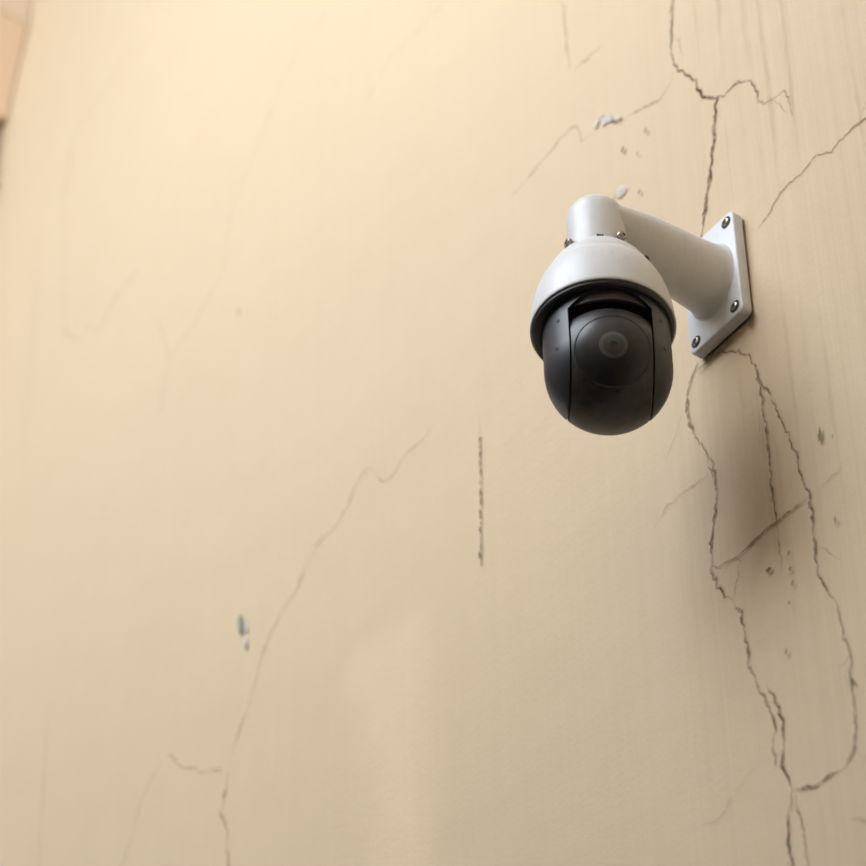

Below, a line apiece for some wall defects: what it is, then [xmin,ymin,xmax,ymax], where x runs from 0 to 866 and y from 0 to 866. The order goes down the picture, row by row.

crack [669,21,758,238]
crack [685,350,835,600]
peeling [238,615,248,650]
crack [768,689,784,733]
crack [775,719,856,795]
crack [786,823,794,865]